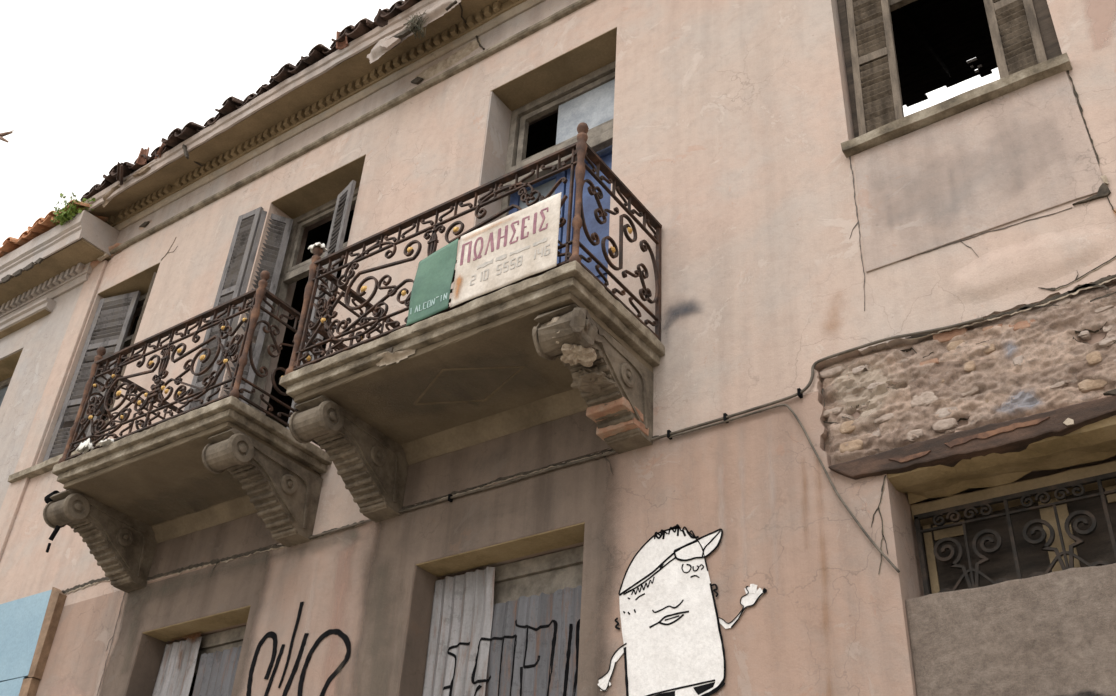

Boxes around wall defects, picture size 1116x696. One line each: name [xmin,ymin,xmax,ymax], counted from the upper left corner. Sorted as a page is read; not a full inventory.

crack [1067,70,1116,213]
crack [849,156,865,311]
crack [901,207,1072,261]
crack [906,256,1116,340]
flaking render [547,317,649,440]
spalling [817,281,1116,465]